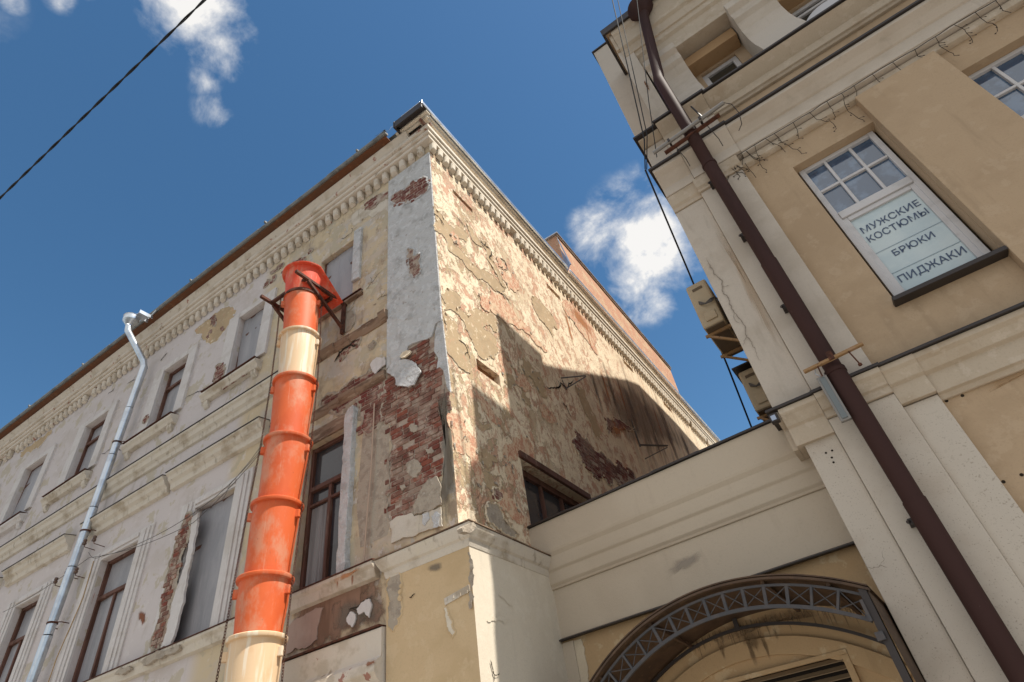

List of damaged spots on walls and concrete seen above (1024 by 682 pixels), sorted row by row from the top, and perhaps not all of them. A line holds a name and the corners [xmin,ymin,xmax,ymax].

flaking render [349,176,431,226]
flaking render [194,305,237,345]
flaking render [319,206,598,543]
flaking render [571,385,636,486]
flaking render [114,511,200,675]
flaking render [286,607,323,655]
flaking render [346,599,373,628]